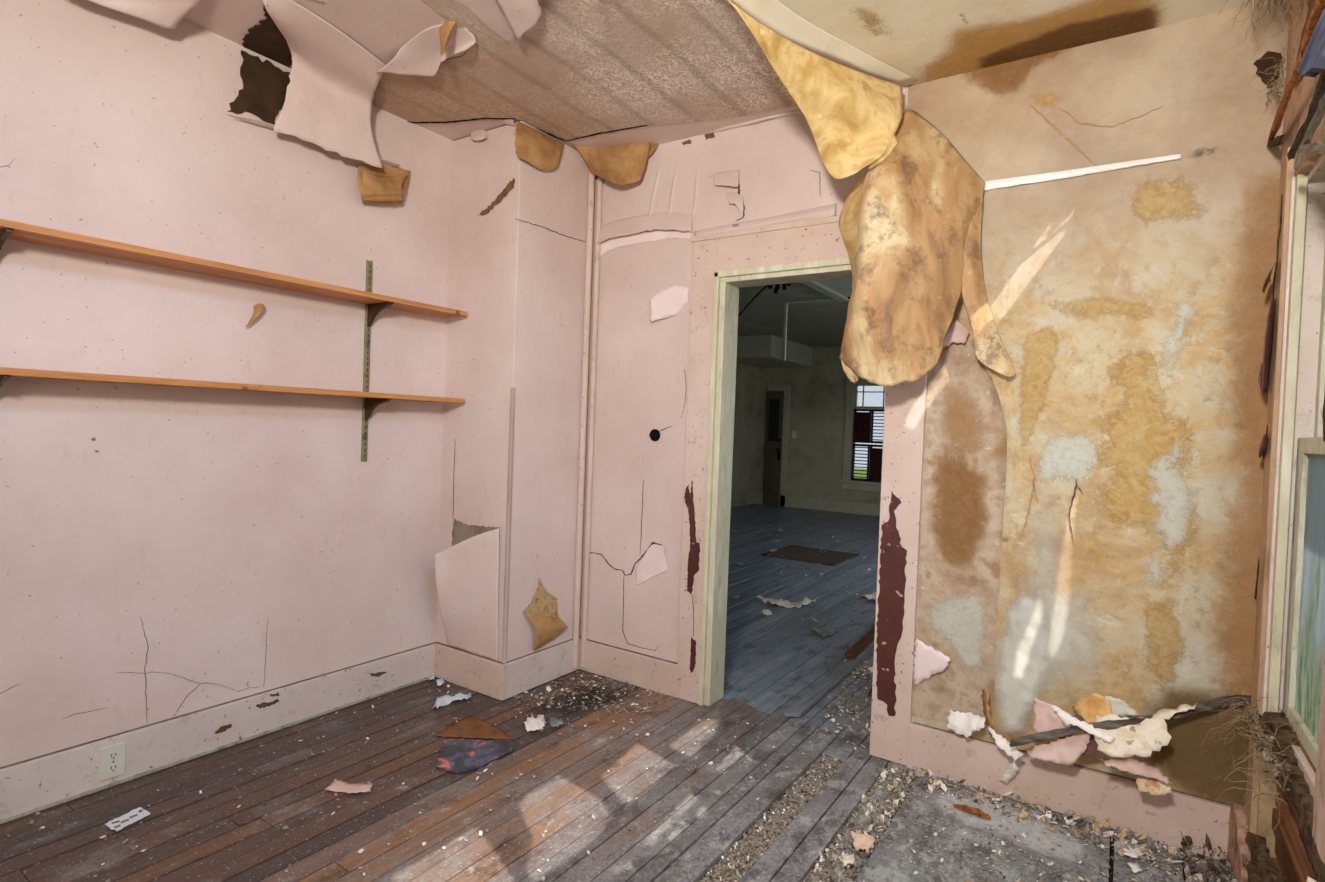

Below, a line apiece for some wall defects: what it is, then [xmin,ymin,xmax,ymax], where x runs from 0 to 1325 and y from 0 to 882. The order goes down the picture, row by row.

leakage [923,0,1158,93]
leakage [1030,95,1163,166]
leakage [933,392,985,565]
flaking render [451,518,500,546]
flaking render [523,578,559,617]
crack [590,480,661,651]
peeling [684,481,700,594]
flaking render [876,339,1007,725]
crack [125,617,268,717]